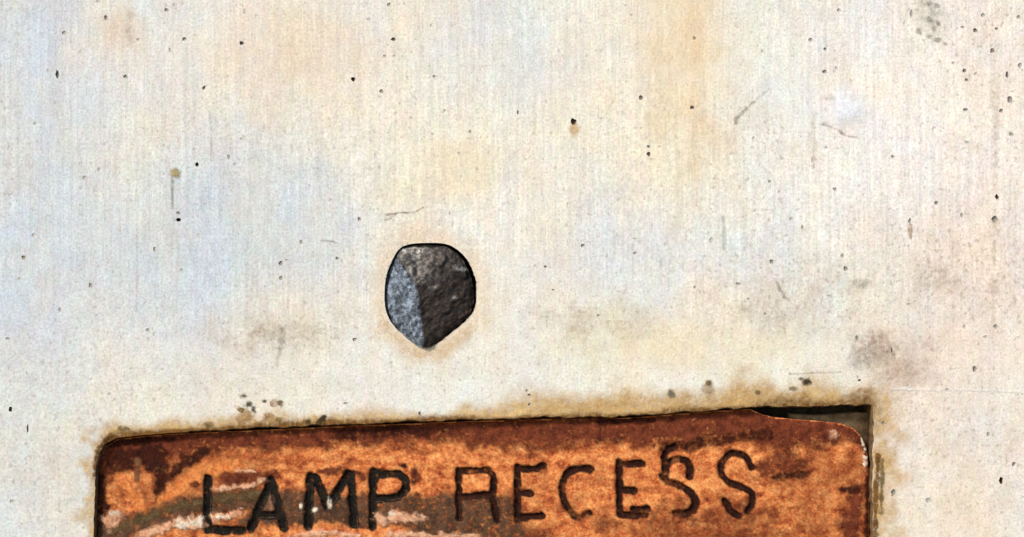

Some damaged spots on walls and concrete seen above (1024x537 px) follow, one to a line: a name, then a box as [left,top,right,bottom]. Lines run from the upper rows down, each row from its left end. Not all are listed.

rust [83,377,893,537]